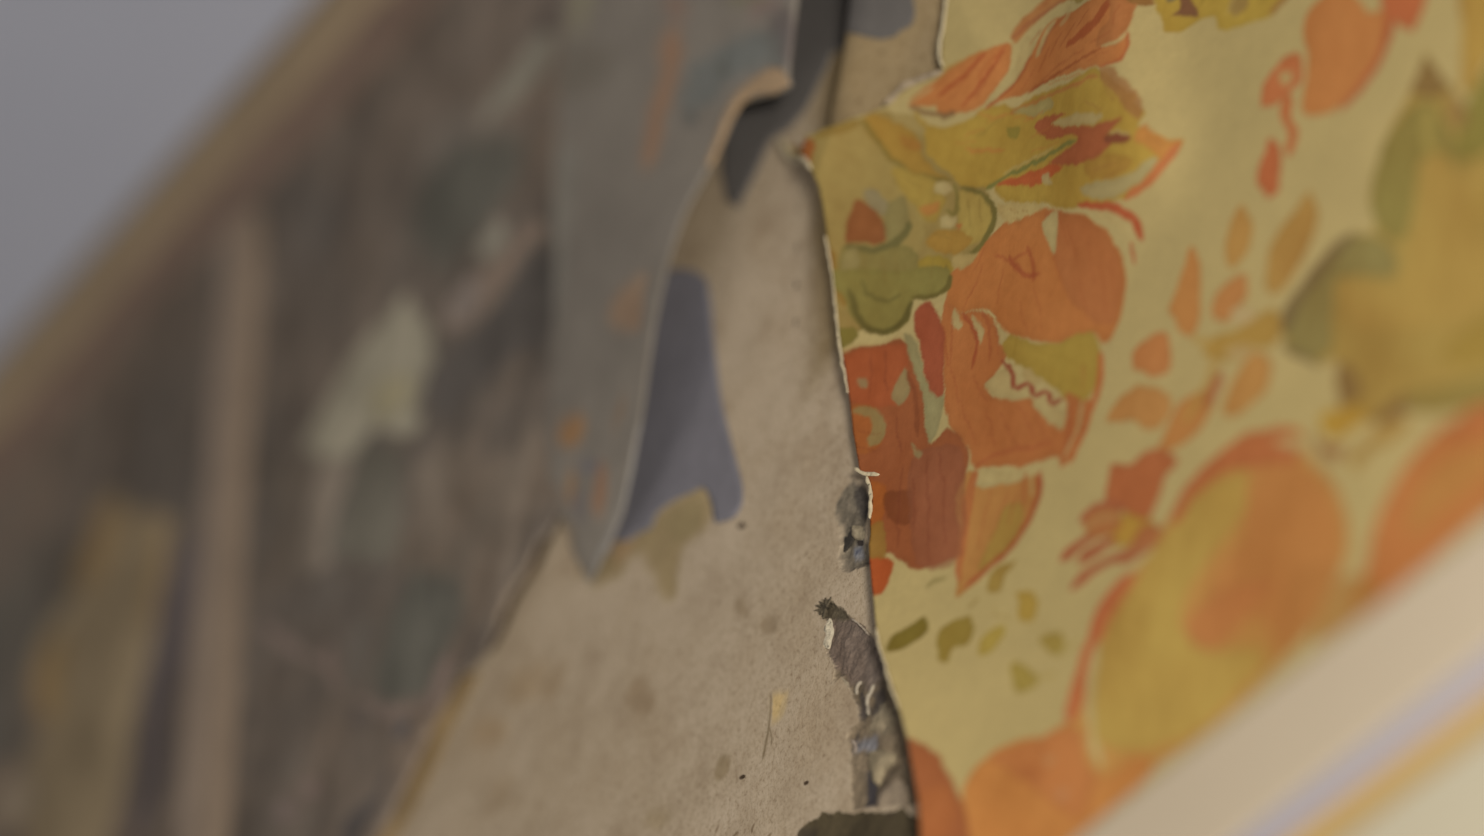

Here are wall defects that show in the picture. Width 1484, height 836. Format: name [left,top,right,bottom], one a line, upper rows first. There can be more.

peeling [548,0,799,584]
spalling [834,478,870,573]
spalling [797,597,920,836]